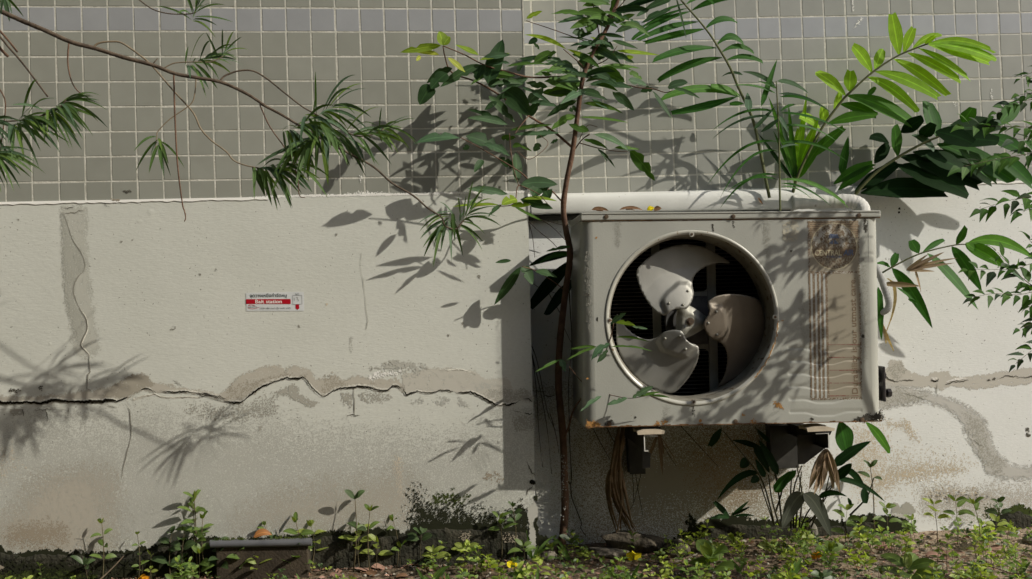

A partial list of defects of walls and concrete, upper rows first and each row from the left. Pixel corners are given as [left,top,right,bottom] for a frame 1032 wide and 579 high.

spalling [0,359,535,409]
crack [0,204,555,471]
water stain [0,370,576,579]
crack [886,376,967,399]